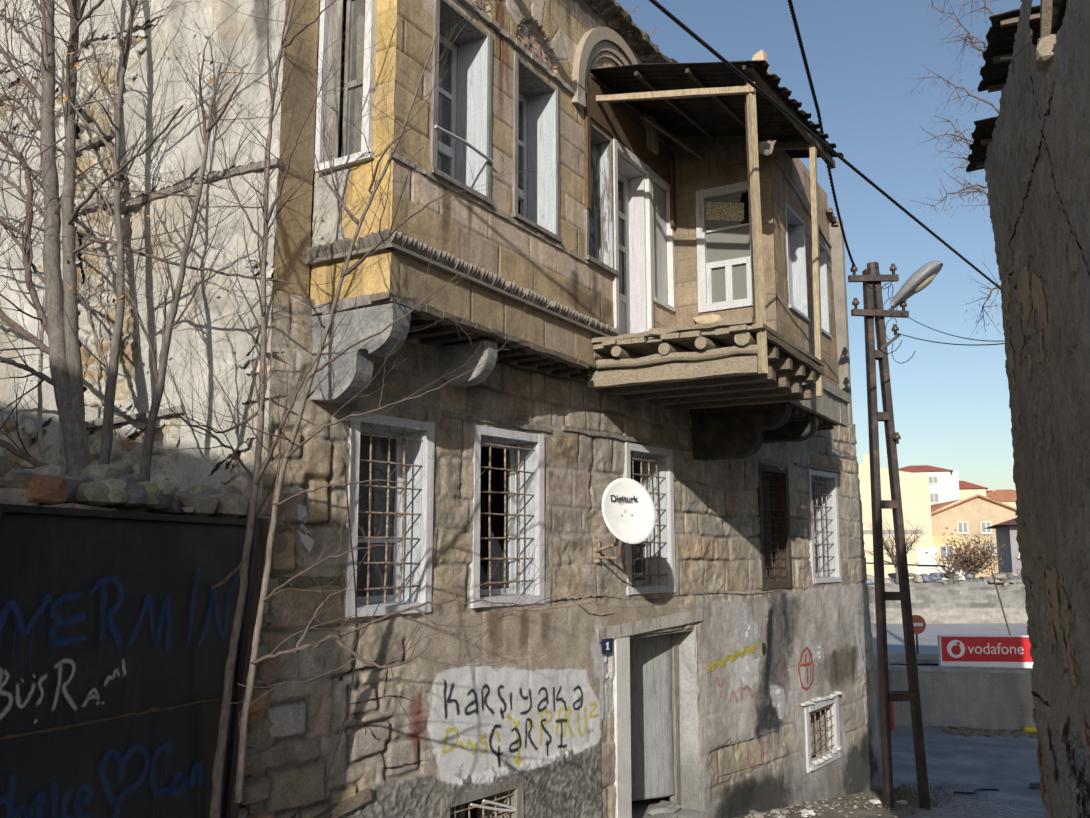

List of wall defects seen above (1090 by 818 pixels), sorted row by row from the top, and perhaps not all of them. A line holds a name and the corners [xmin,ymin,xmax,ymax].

corrosion [495,0,508,90]
spalling [0,77,41,132]
spalling [55,92,63,131]
spalling [74,32,182,482]
crack [1007,61,1090,365]
spalling [0,409,60,472]
leakage [766,593,788,685]
leakage [844,733,877,795]